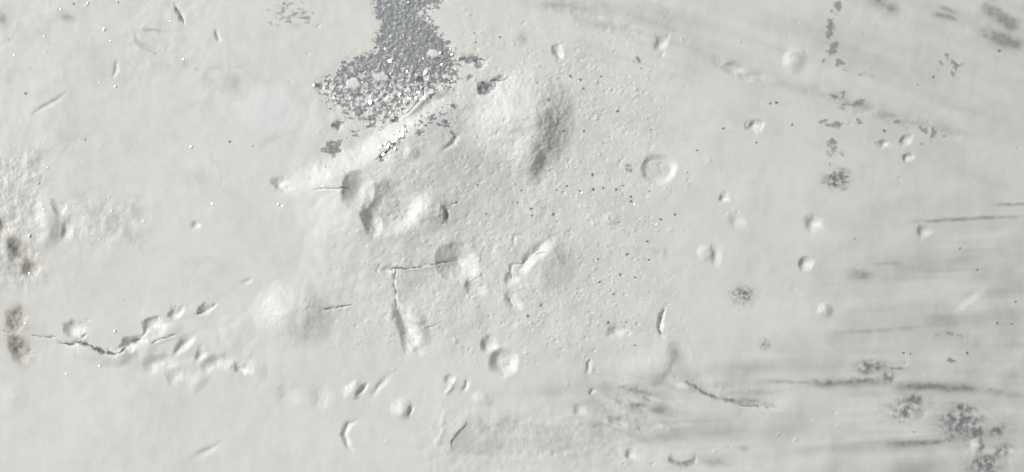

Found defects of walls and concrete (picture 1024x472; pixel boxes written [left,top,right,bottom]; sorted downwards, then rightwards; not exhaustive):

peeling [305,0,511,162]
crack [390,261,445,308]
crack [11,332,173,354]